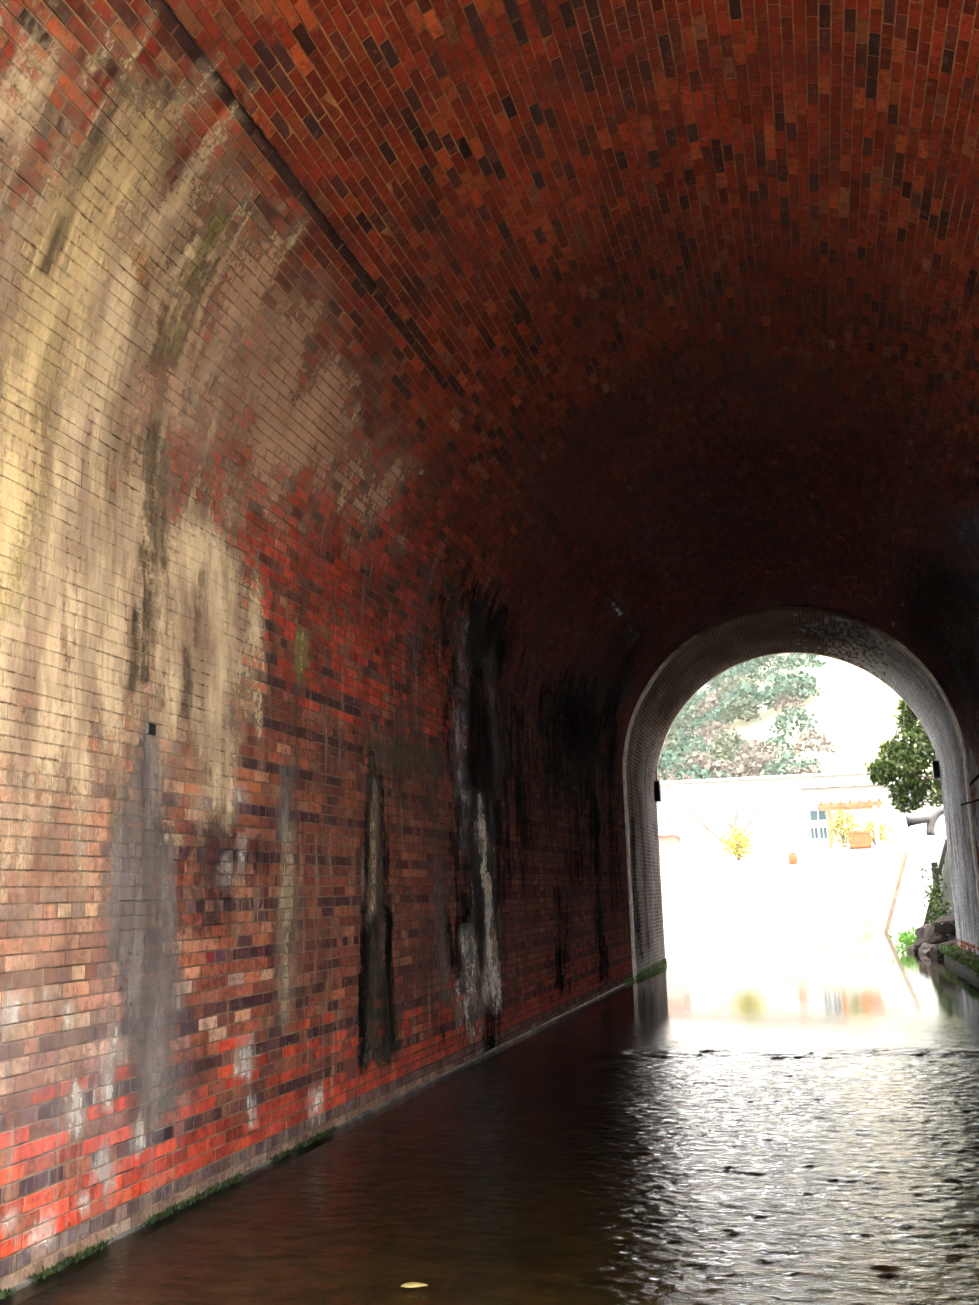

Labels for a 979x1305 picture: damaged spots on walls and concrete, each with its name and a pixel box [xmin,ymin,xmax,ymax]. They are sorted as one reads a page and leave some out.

damp [0,17,425,1116]
damp [358,564,656,1074]
damp [894,525,979,852]
damp [69,1083,82,1132]
damp [98,1150,110,1192]